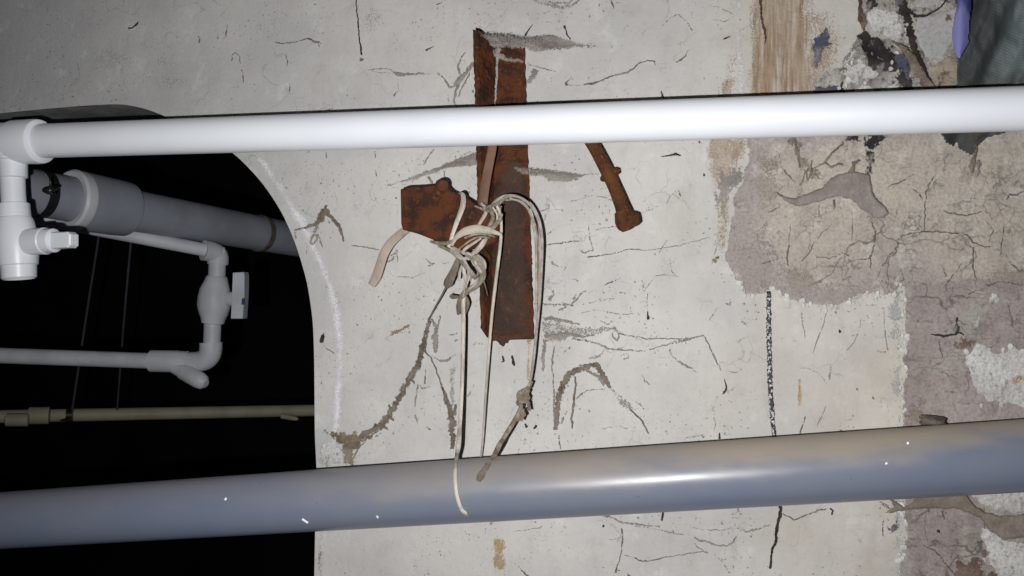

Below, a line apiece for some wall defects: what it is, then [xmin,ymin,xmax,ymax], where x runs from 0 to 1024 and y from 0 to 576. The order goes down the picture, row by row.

crack [565,53,687,86]
damp [718,0,844,97]
flaking render [813,0,958,94]
damp [857,0,952,90]
damp [842,135,886,174]
flaking render [725,131,1024,428]
crack [763,174,1024,328]
crack [766,291,826,437]
crack [919,332,964,378]
crack [769,506,834,569]
flaking render [892,492,1024,576]